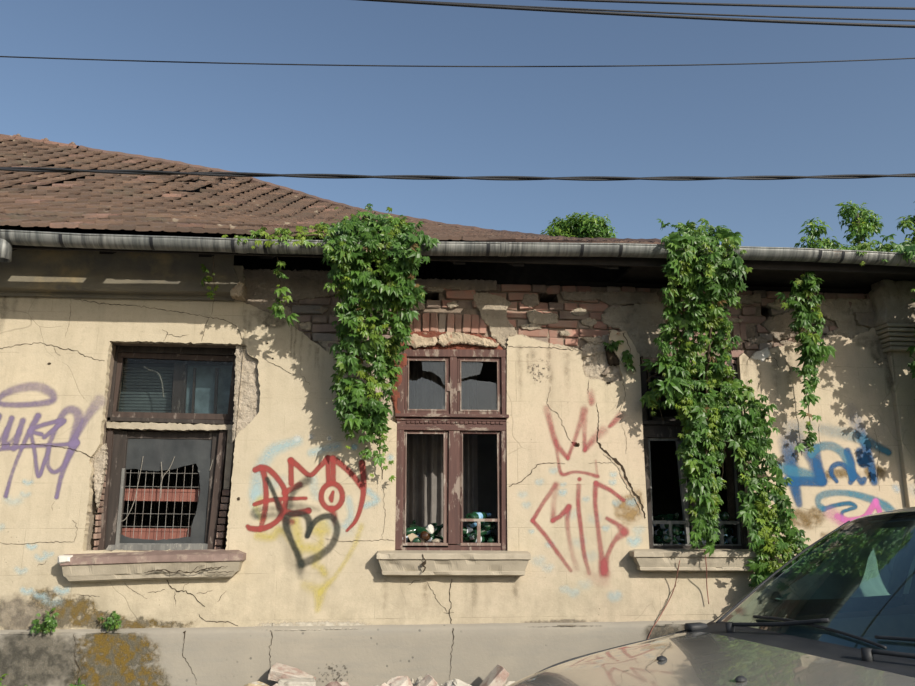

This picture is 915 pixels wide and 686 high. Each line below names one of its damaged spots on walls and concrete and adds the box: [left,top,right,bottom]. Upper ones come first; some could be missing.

crack [0,299,242,361]
spalling [232,345,260,443]
flaking render [230,269,718,422]
flaking render [719,290,875,367]
spalling [91,443,108,508]
crack [588,382,646,518]
crack [126,565,238,685]
crack [410,554,454,677]
water stain [647,624,685,639]